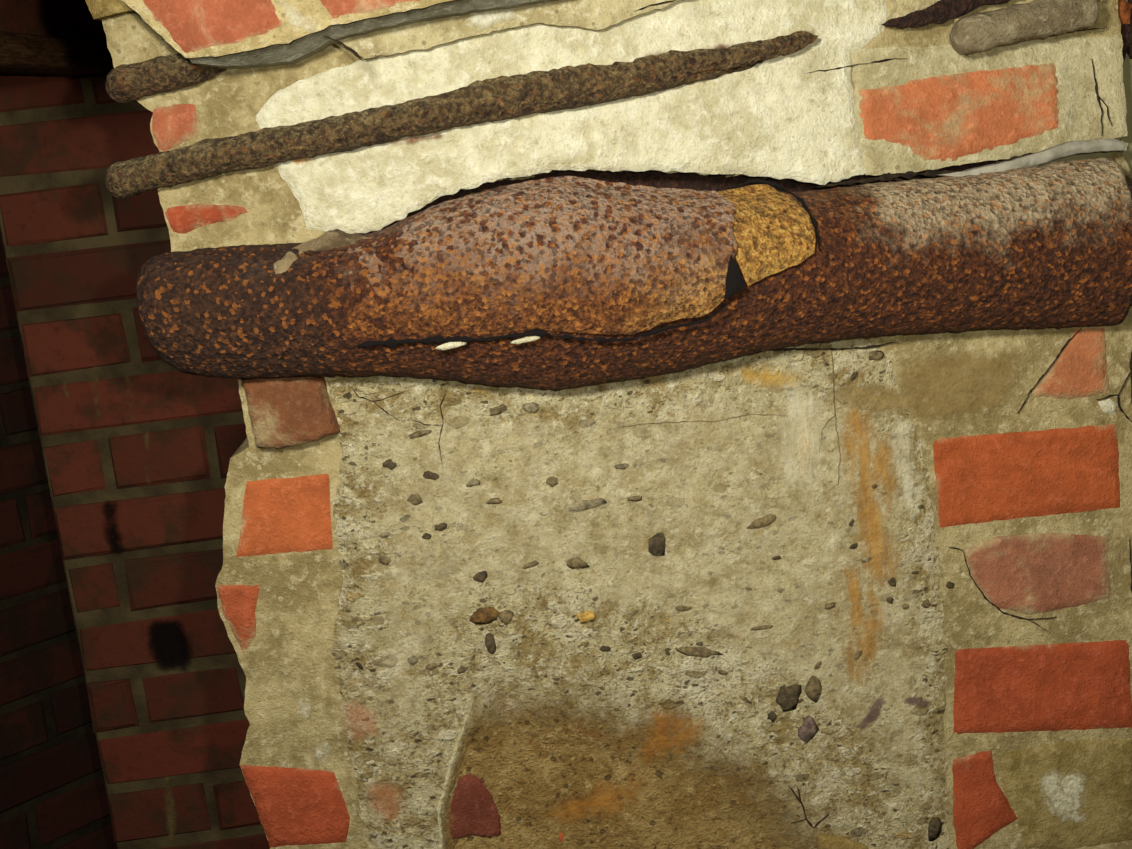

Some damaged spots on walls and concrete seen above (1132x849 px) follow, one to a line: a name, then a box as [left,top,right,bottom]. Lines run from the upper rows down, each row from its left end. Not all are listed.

spalling [881,0,1011,29]
corrosion [432,31,818,99]
spalling [152,104,198,152]
peeling [939,139,1128,177]
spalling [165,203,251,234]
corrosion [321,176,815,337]
crack [1018,327,1083,413]
crack [1097,371,1132,422]
corrosion [846,409,893,578]
corrosion [845,571,878,680]
damp [860,699,882,728]
damp [906,697,929,706]